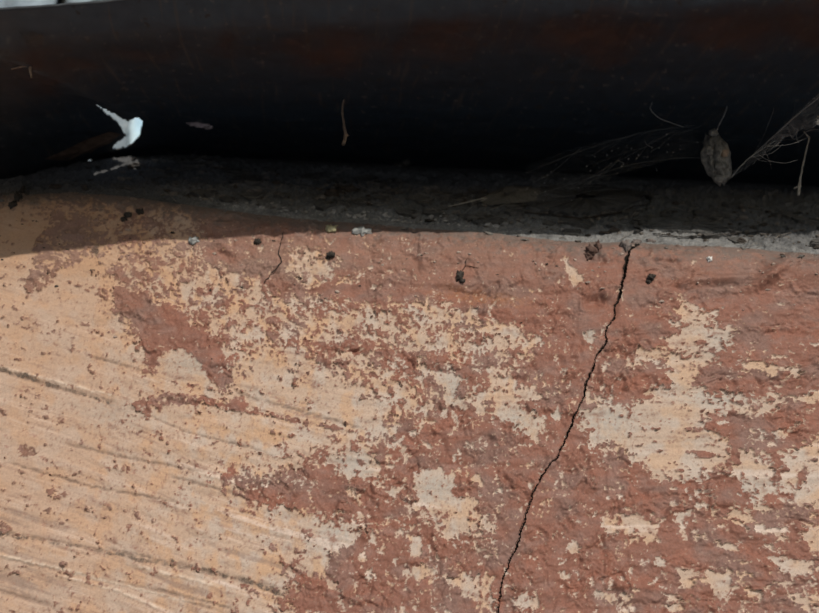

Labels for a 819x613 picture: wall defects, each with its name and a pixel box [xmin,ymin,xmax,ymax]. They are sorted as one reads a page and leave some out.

peeling [561,257,584,286]
peeling [0,193,561,613]
crack [497,198,764,613]
peeling [577,301,819,544]
peeling [566,540,580,554]
peeling [715,541,739,551]
peeling [768,523,819,577]
peeling [594,591,631,604]
peeling [665,603,685,613]
peeling [675,567,733,602]
peeling [743,587,764,602]
peeling [788,588,819,613]